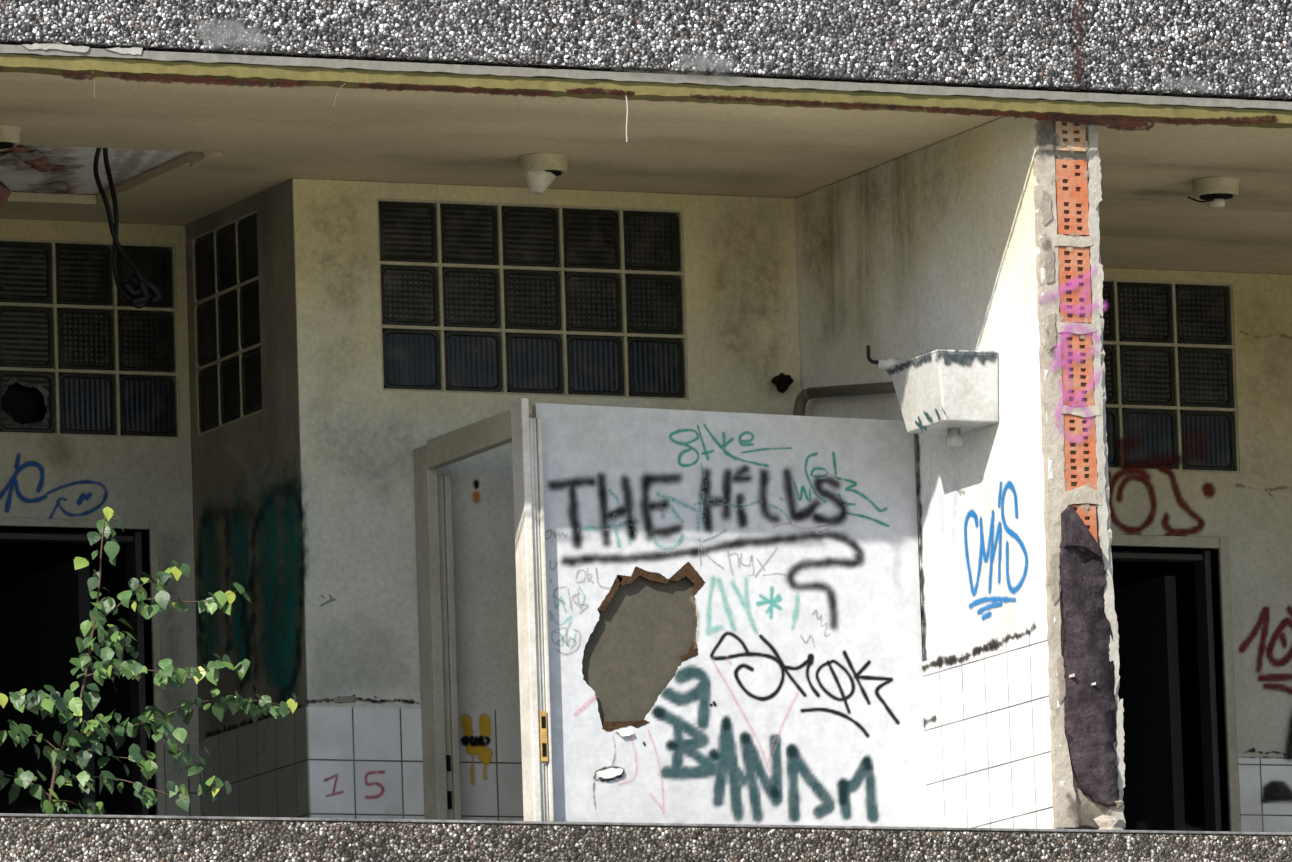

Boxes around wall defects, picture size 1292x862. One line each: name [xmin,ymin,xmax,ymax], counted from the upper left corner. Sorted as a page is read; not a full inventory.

spalling [0,145,82,194]
spalling [1093,150,1102,209]
spalling [1040,190,1055,284]
spalling [1047,313,1056,355]
spalling [597,562,705,612]
spalling [1047,552,1060,605]
spalling [681,639,698,662]
spalling [602,720,649,737]
spalling [1057,656,1066,704]
spalling [1109,615,1125,794]
spalling [596,768,623,779]
spalling [1067,793,1111,825]